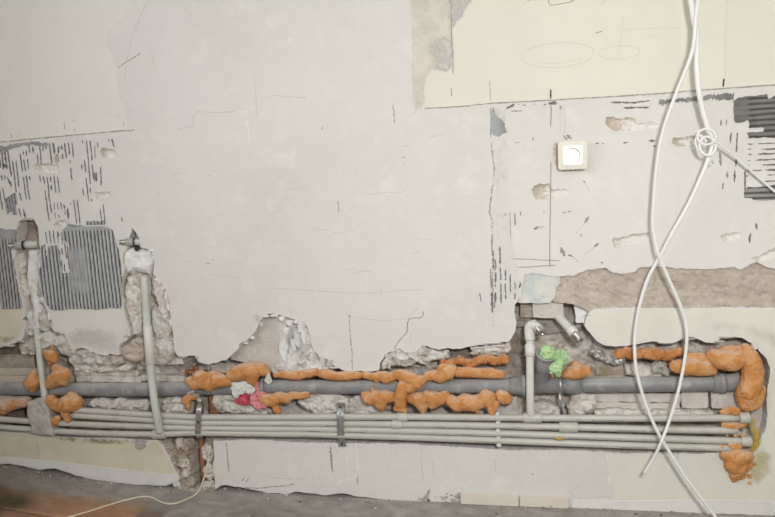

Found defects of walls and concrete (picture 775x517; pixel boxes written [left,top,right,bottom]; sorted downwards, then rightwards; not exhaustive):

flaking render [0,217,344,382]
crack [272,269,424,370]
peeling [359,0,775,503]
peeling [0,394,223,492]
flaking render [81,394,397,421]